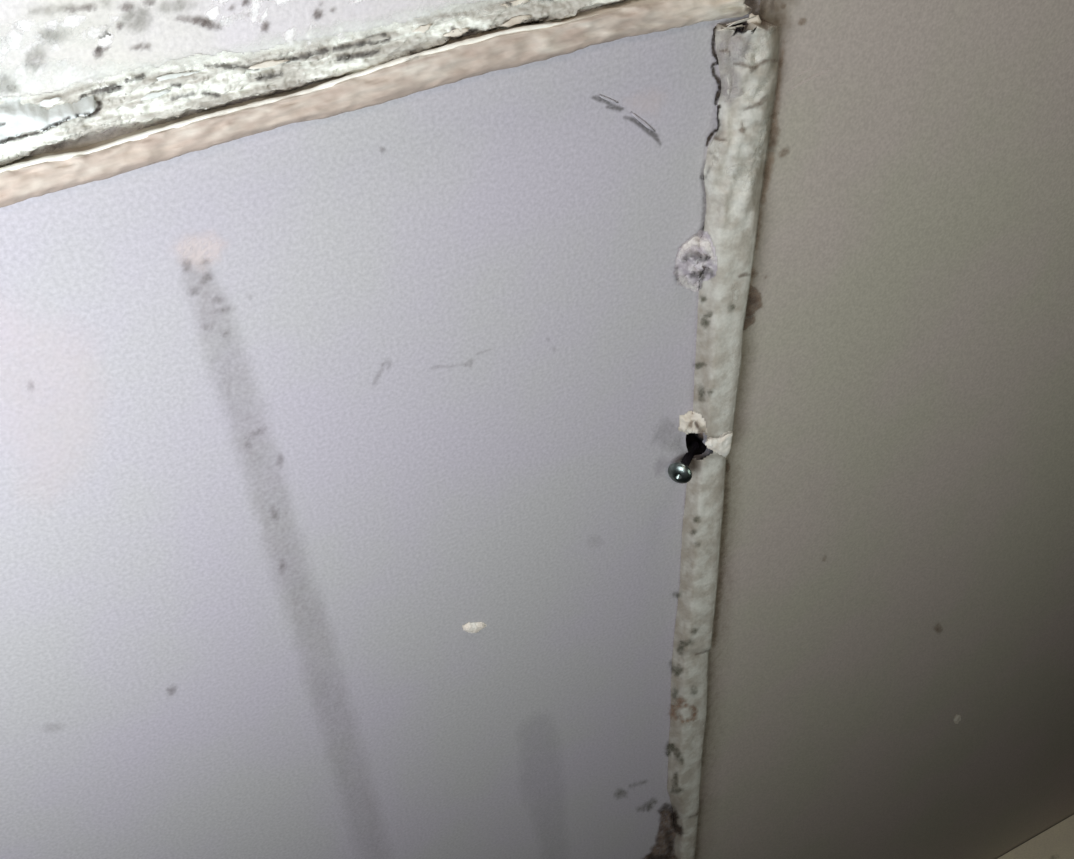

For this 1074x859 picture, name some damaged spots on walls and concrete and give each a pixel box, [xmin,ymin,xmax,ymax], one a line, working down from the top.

peeling [0,0,622,167]
crack [706,26,763,147]
peeling [718,13,774,66]